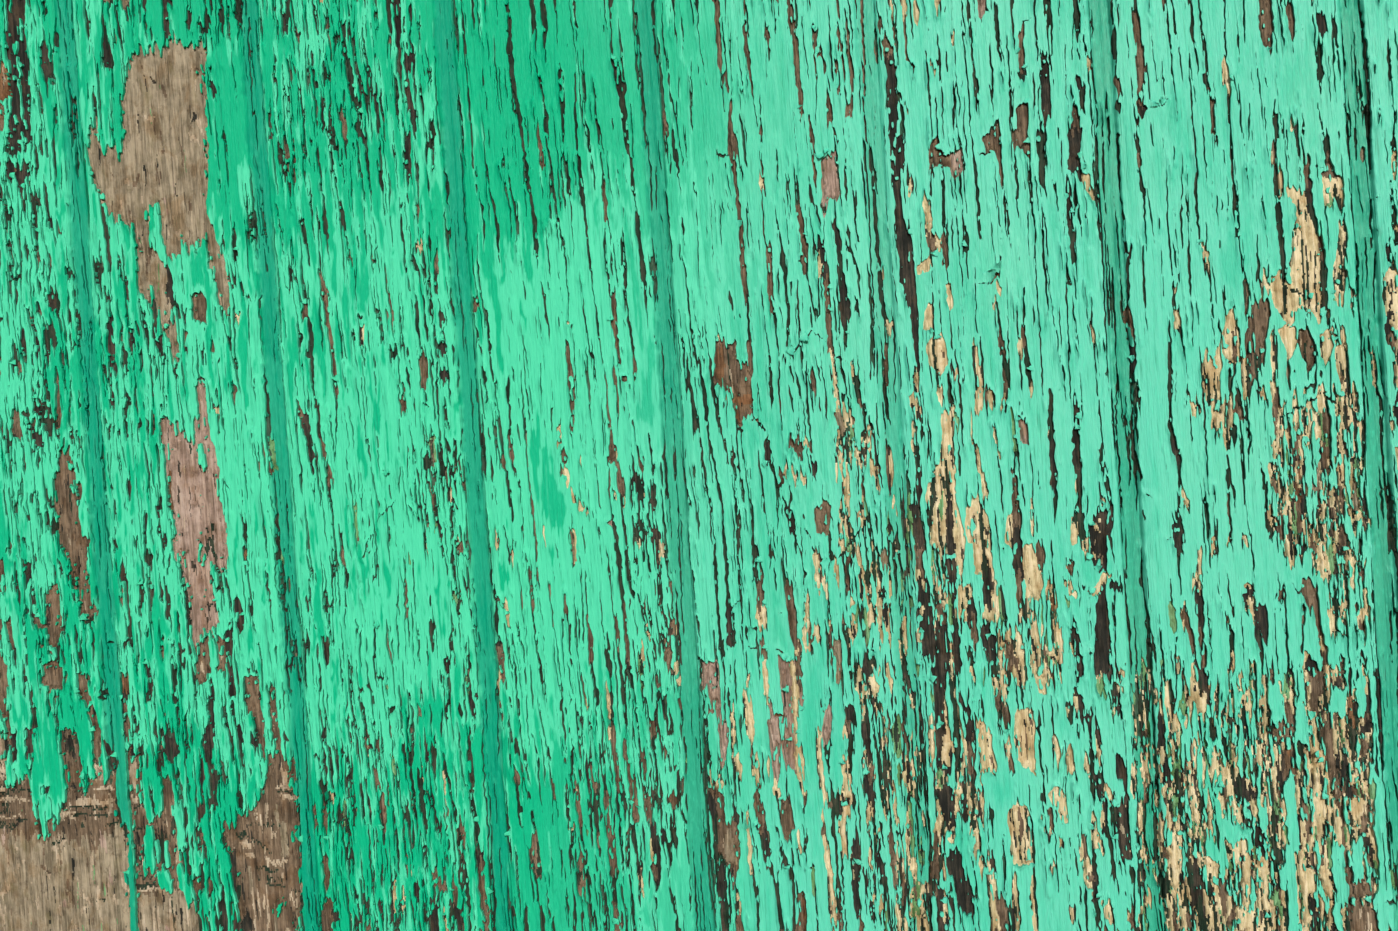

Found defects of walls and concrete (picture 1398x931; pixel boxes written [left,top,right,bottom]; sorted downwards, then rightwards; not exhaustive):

peeling [0,0,33,238]
peeling [0,431,203,931]
peeling [87,0,237,367]
peeling [160,377,230,706]
peeling [221,662,305,931]
peeling [709,334,759,471]
peeling [698,494,883,931]
peeling [814,147,841,218]
peeling [908,89,1044,238]
peeling [877,255,1123,931]
peeling [1161,489,1378,931]
peeling [1189,152,1355,535]